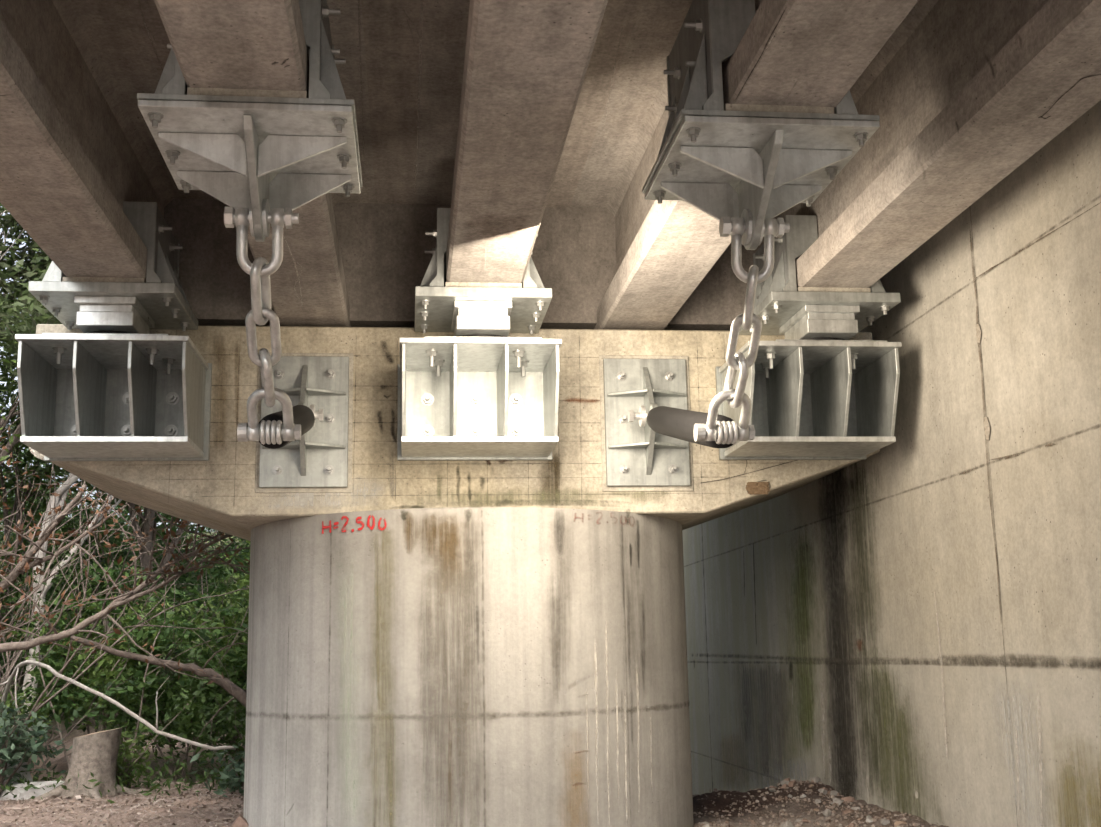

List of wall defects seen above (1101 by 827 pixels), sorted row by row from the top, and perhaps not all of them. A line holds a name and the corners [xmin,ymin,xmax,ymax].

crack [959,204,1098,614]
damp [429,523,478,826]
damp [586,630,652,827]
damp [724,469,928,804]
damp [940,655,1056,666]